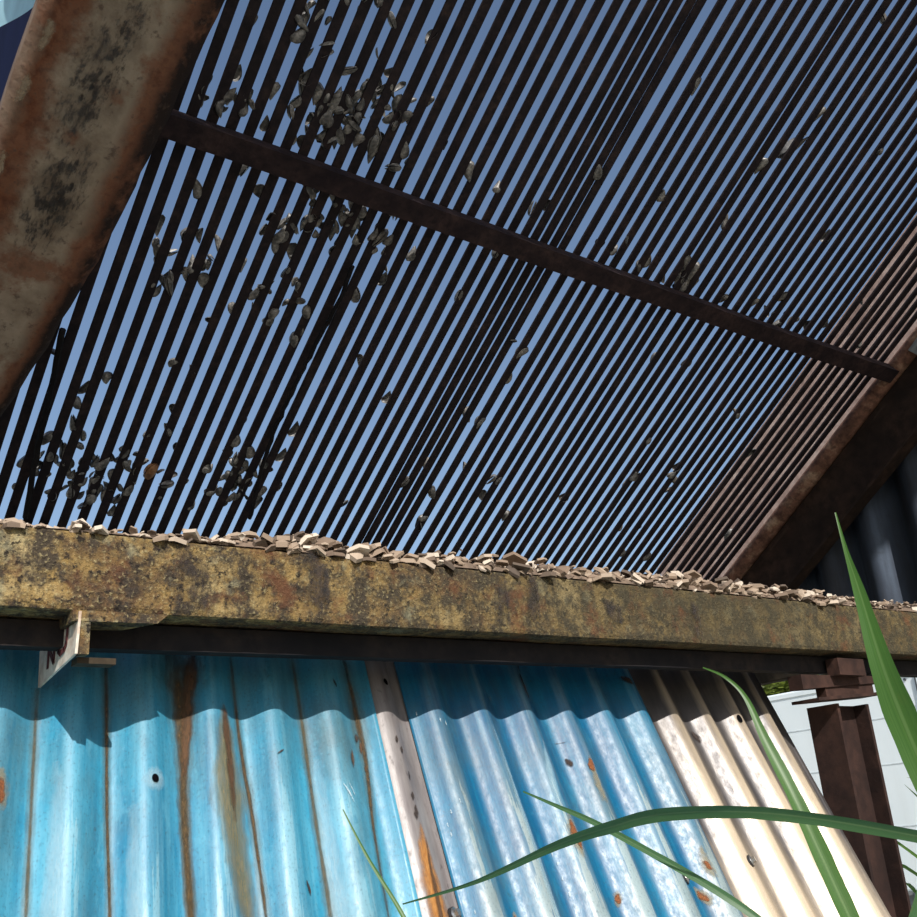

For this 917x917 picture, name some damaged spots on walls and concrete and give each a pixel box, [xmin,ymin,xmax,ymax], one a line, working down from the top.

rust [48,2,146,145]
rust [19,148,92,252]
rust [169,656,196,917]
rust [217,694,267,917]
rust [419,828,447,917]